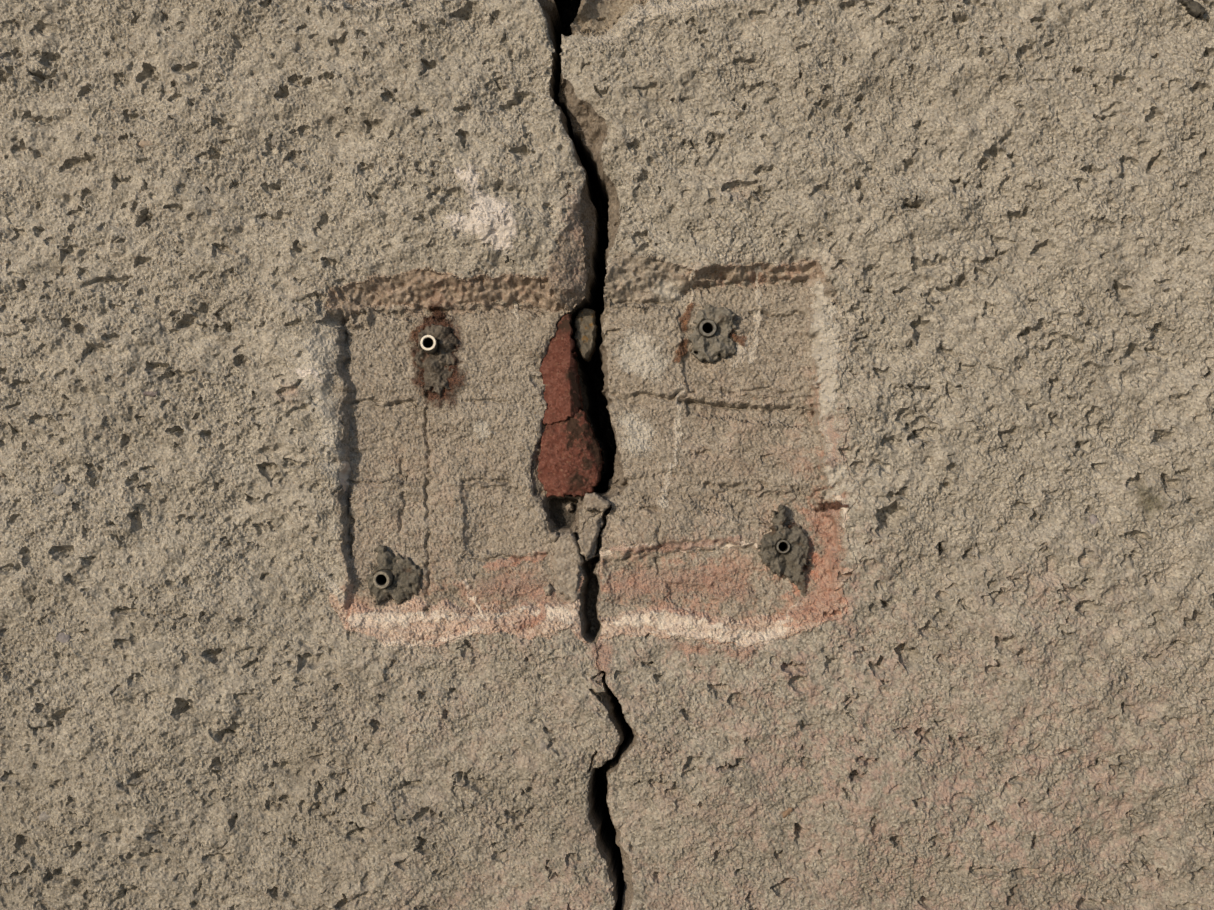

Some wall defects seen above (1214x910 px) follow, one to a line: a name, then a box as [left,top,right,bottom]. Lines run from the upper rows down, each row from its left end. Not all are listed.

crack [338,317,351,364]
crack [333,394,513,613]
spalling [312,250,854,648]
crack [461,0,833,910]